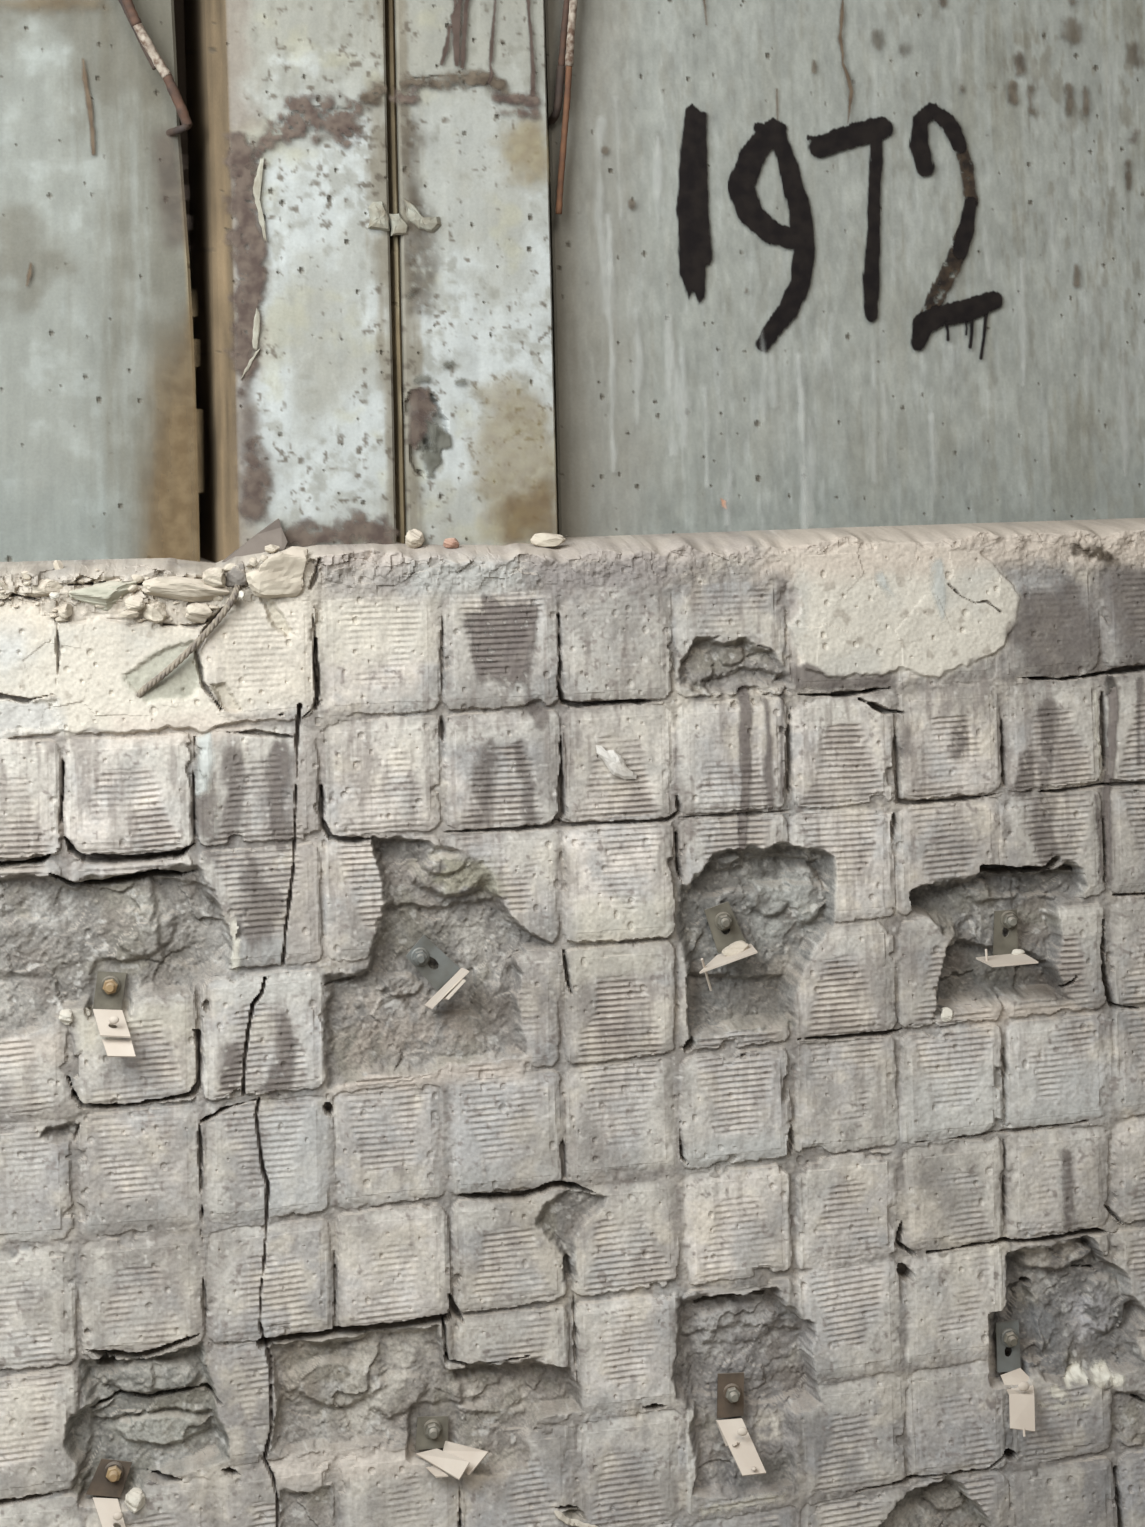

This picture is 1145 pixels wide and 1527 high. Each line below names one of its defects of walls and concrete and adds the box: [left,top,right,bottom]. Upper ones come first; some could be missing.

damp [224,0,540,394]
damp [239,436,271,520]
damp [284,511,397,547]
damp [409,361,466,477]
spalling [0,862,234,1043]
spalling [321,835,556,1090]
spalling [675,841,838,1045]
spalling [909,859,1090,1020]
crack [241,637,321,1527]
spalling [267,1317,585,1477]
spalling [671,1286,825,1500]
spalling [988,1229,1145,1447]